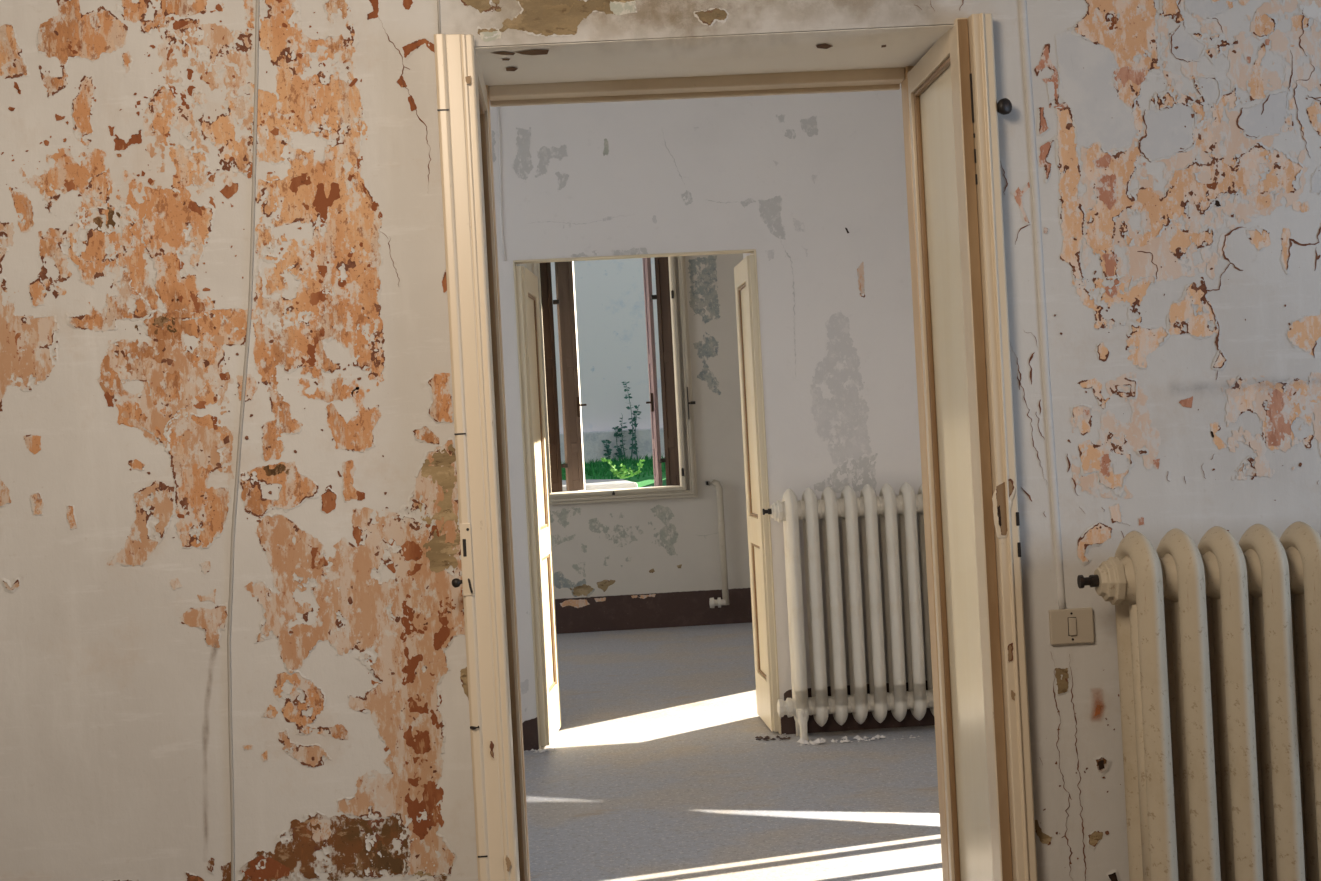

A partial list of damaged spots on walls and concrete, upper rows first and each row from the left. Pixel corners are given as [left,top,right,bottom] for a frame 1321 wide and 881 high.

peeling [459,0,637,71]
peeling [693,8,729,27]
crack [1138,0,1223,162]
crack [1236,8,1321,158]
peeling [1011,0,1321,566]
crack [1204,227,1247,381]
crack [1287,227,1321,275]
crack [1311,341,1319,358]
peeling [0,0,469,881]
peeling [550,503,682,608]
peeling [1035,820,1053,845]
crack [1039,650,1089,881]